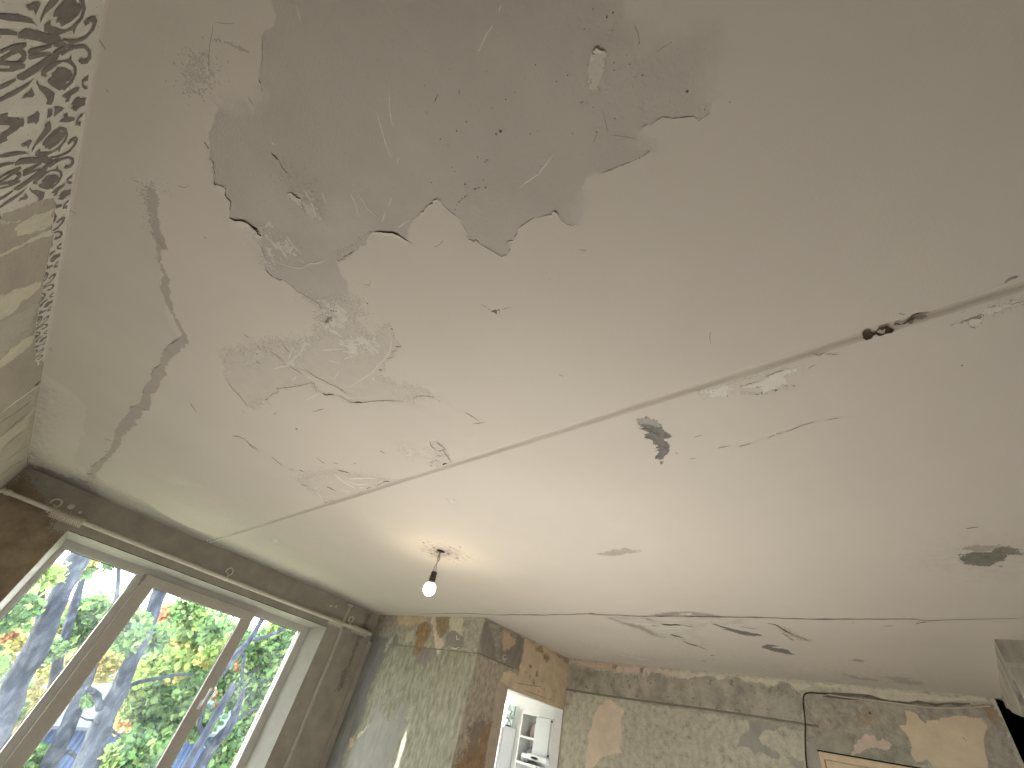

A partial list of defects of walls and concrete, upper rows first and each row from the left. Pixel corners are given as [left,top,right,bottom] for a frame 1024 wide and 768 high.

peeling [195,0,754,323]
peeling [84,177,189,483]
peeling [698,353,839,400]
spalling [862,313,927,340]
spalling [633,416,671,464]
crack [435,611,1018,641]
peeling [325,615,525,768]
peeling [567,665,1022,768]